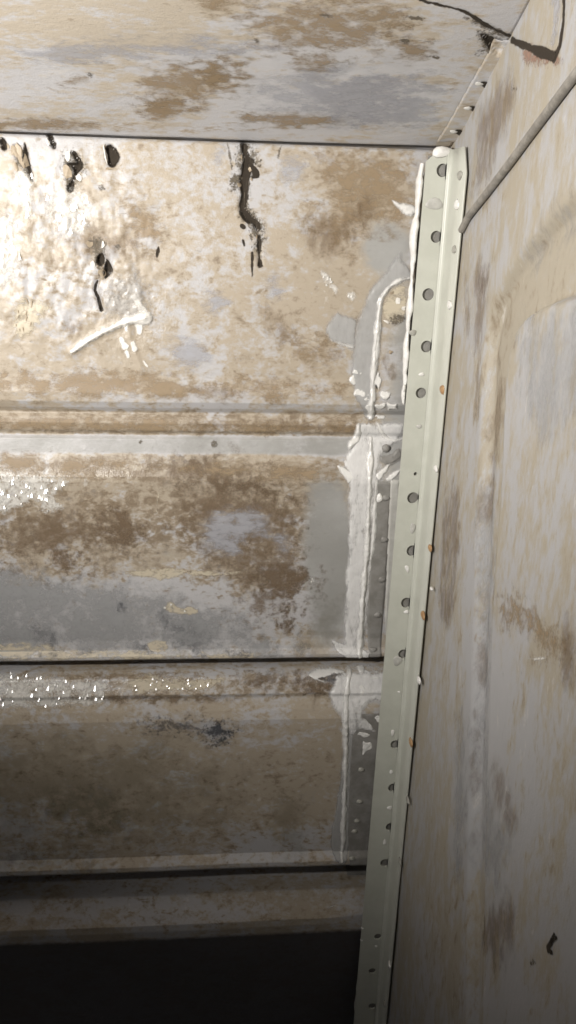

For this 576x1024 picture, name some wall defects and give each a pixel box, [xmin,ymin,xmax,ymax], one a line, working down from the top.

crack [419,0,565,64]
spalling [0,137,34,218]
peeling [45,135,89,236]
spalling [103,144,120,170]
crack [227,142,281,276]
leakage [119,294,148,367]
leakage [205,511,265,552]
leakage [0,571,277,660]